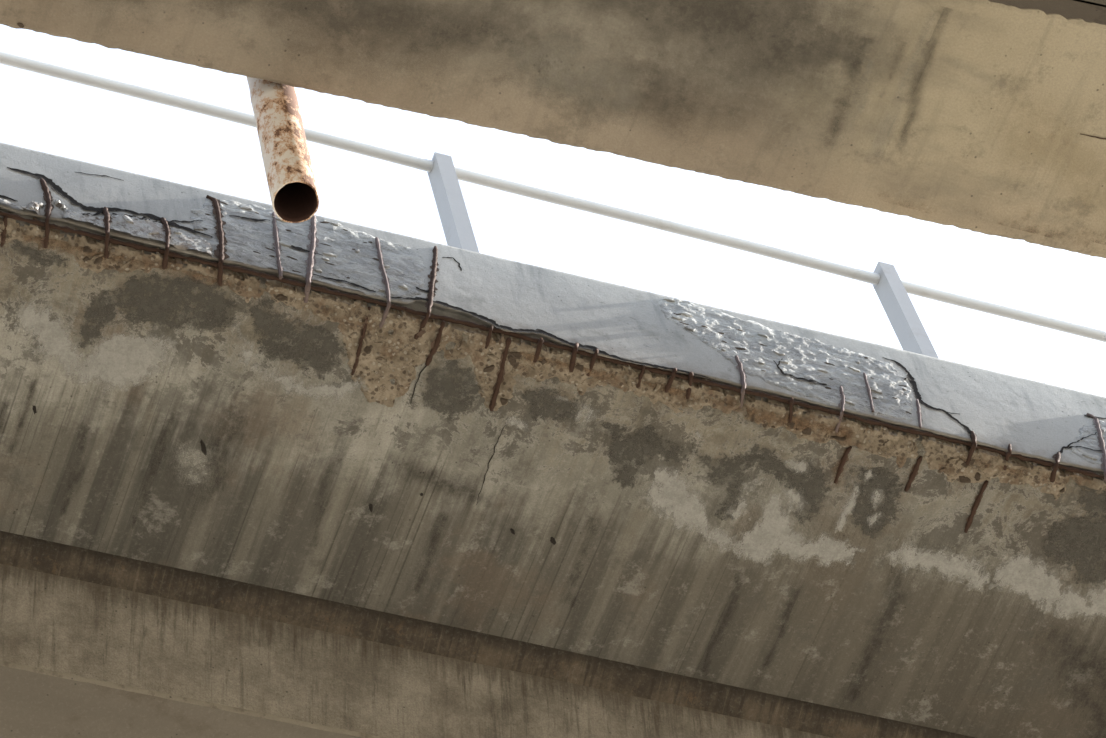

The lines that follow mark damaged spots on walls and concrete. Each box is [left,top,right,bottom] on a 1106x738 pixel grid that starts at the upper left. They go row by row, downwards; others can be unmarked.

crack [7,167,213,237]
crack [229,214,270,222]
damp [422,360,481,420]
corrosion [0,178,1106,484]
peeling [0,198,1106,500]
crack [774,359,827,385]
crack [882,357,977,440]
crack [1059,415,1106,453]
damp [506,387,903,565]
corrosion [904,456,922,492]
corrosion [964,480,989,533]
damp [888,483,1106,619]